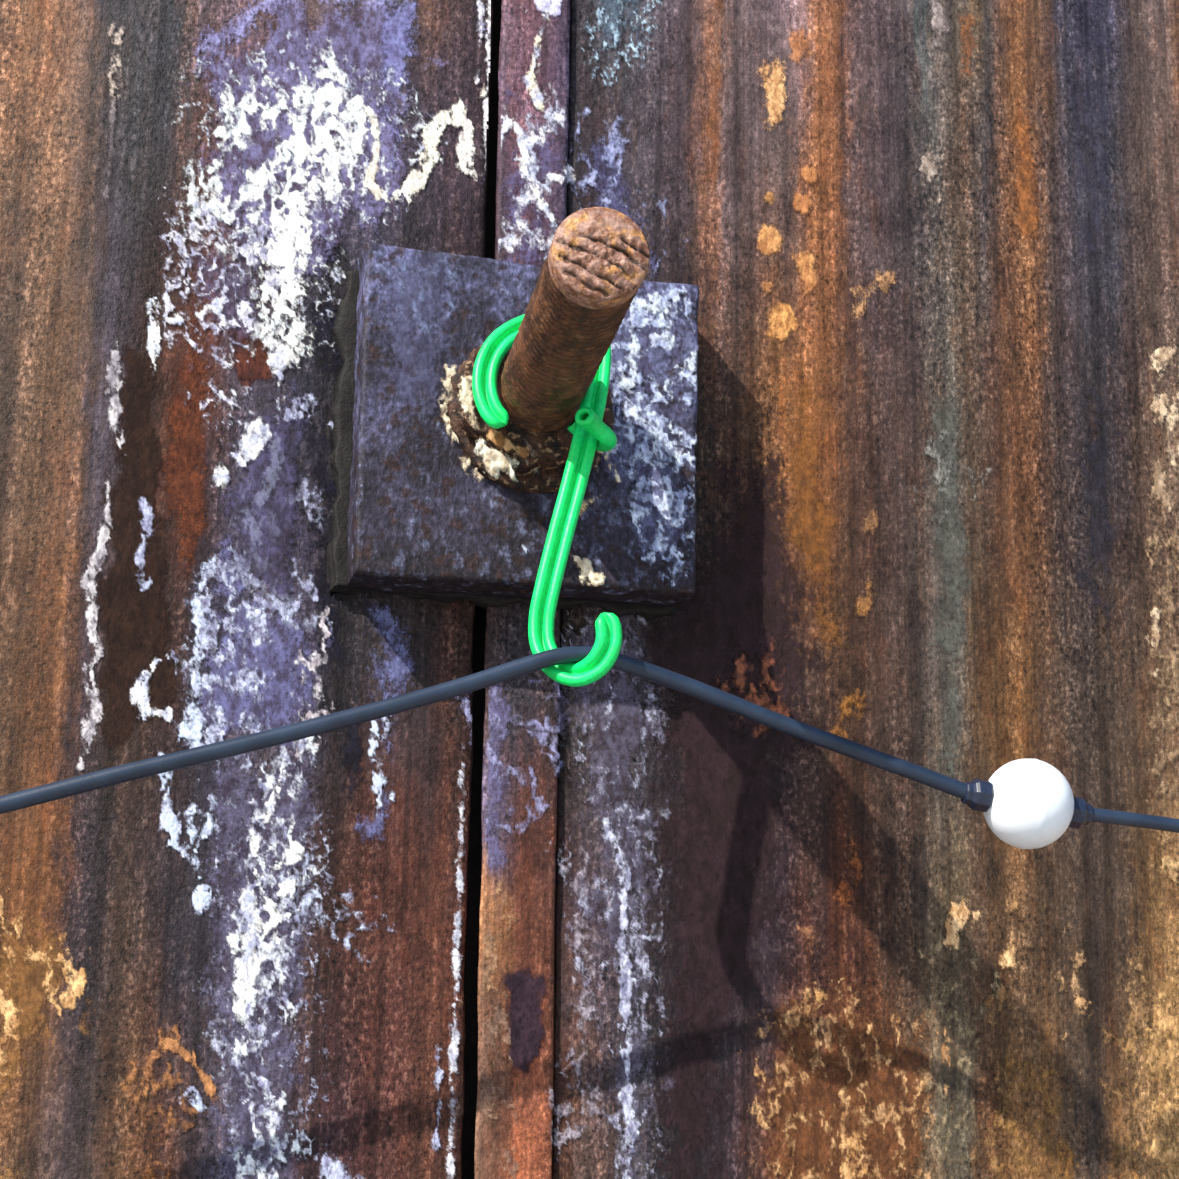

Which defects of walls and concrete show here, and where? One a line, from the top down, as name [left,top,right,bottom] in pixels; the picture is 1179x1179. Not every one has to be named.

rust [230,327,274,389]
rust [160,348,214,572]
rust [722,654,789,717]
peeling [0,896,87,1094]